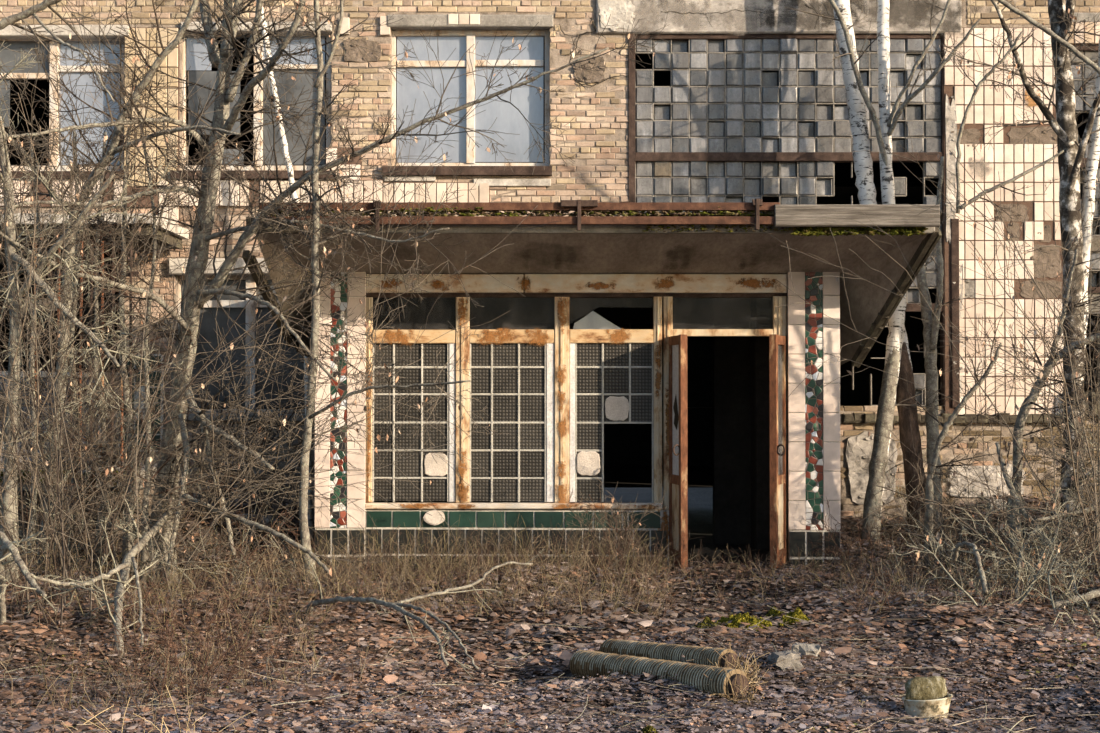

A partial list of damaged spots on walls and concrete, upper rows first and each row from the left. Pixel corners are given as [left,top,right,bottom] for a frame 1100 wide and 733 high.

leakage [725,0,835,30]
leakage [850,0,963,35]
spalling [1007,126,1057,148]
spalling [994,204,1029,242]
spalling [1020,225,1062,299]
corrosion [588,282,616,290]
corrosion [736,278,781,289]
corrosion [381,329,413,345]
corrosion [607,328,630,343]
corrosion [556,366,566,437]
corrosion [458,448,474,508]
corrosion [554,461,577,509]